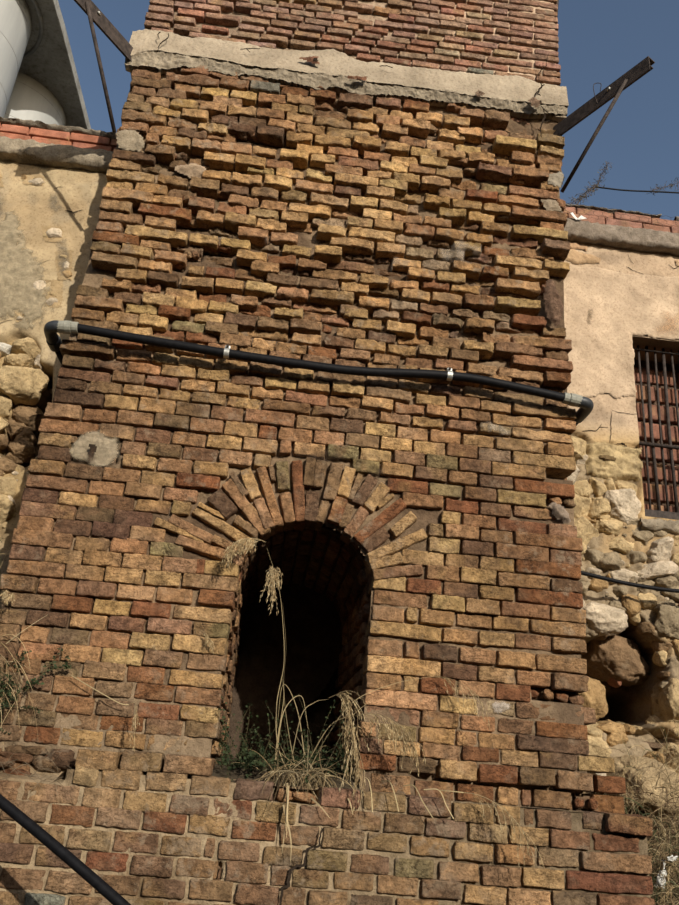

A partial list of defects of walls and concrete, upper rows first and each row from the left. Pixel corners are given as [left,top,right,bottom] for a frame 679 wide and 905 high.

crack [534,54,551,138]
spalling [19,173,45,187]
crack [585,410,640,449]